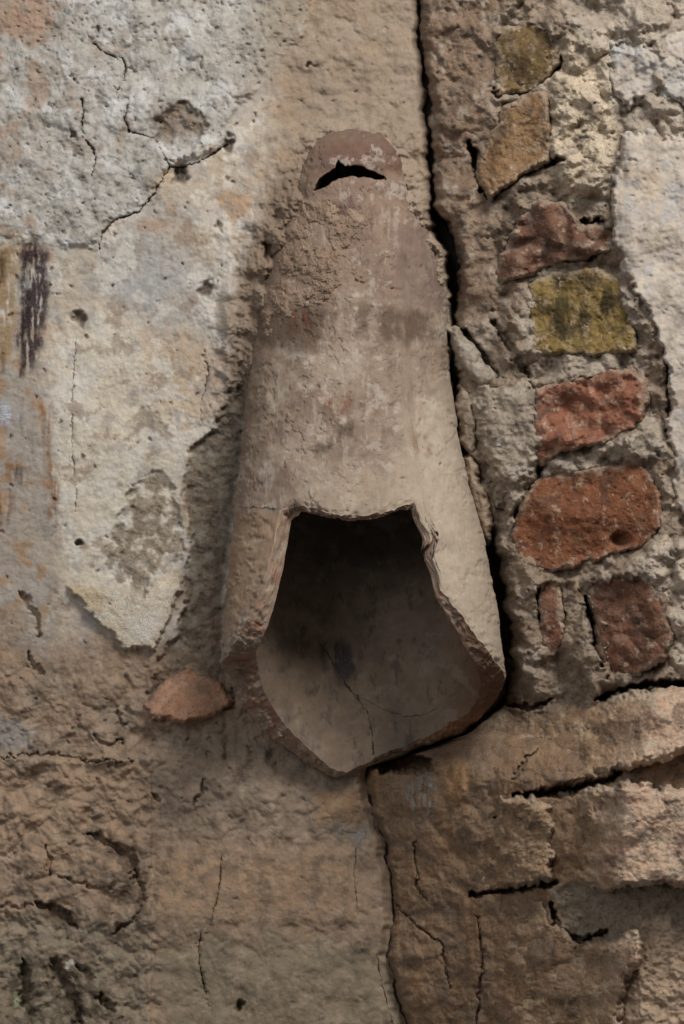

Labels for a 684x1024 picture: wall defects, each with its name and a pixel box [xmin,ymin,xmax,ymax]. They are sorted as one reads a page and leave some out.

crack [94,43,153,138]
crack [99,146,224,250]
crack [416,0,459,325]
damp [0,241,48,375]
crack [450,362,458,397]
crack [486,530,513,660]
crack [599,681,684,699]
crack [520,775,614,795]
spalling [38,901,78,929]
spalling [88,831,148,932]
crack [345,778,450,1024]
spalling [9,956,117,1024]